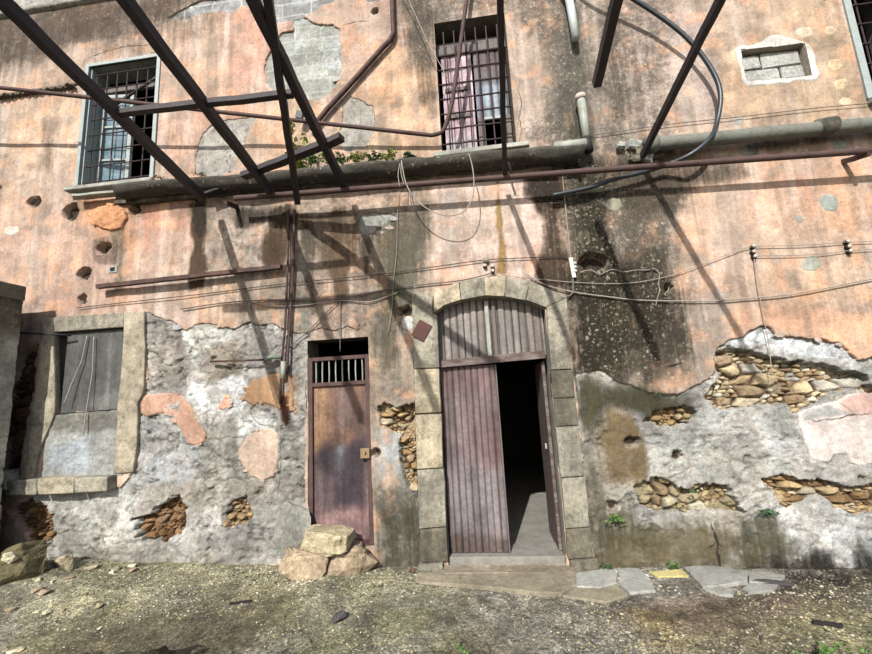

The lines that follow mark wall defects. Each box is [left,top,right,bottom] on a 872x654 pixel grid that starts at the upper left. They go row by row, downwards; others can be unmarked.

flaking render [169,0,248,21]
flaking render [261,0,342,101]
flaking render [195,118,256,176]
flaking render [340,97,375,153]
leakage [623,152,744,215]
leakage [188,200,207,290]
leakage [235,205,429,366]
leakage [524,160,689,479]
flaking render [18,313,310,565]
flaking render [380,403,418,491]
flaking render [575,326,872,568]
leakage [586,462,872,569]